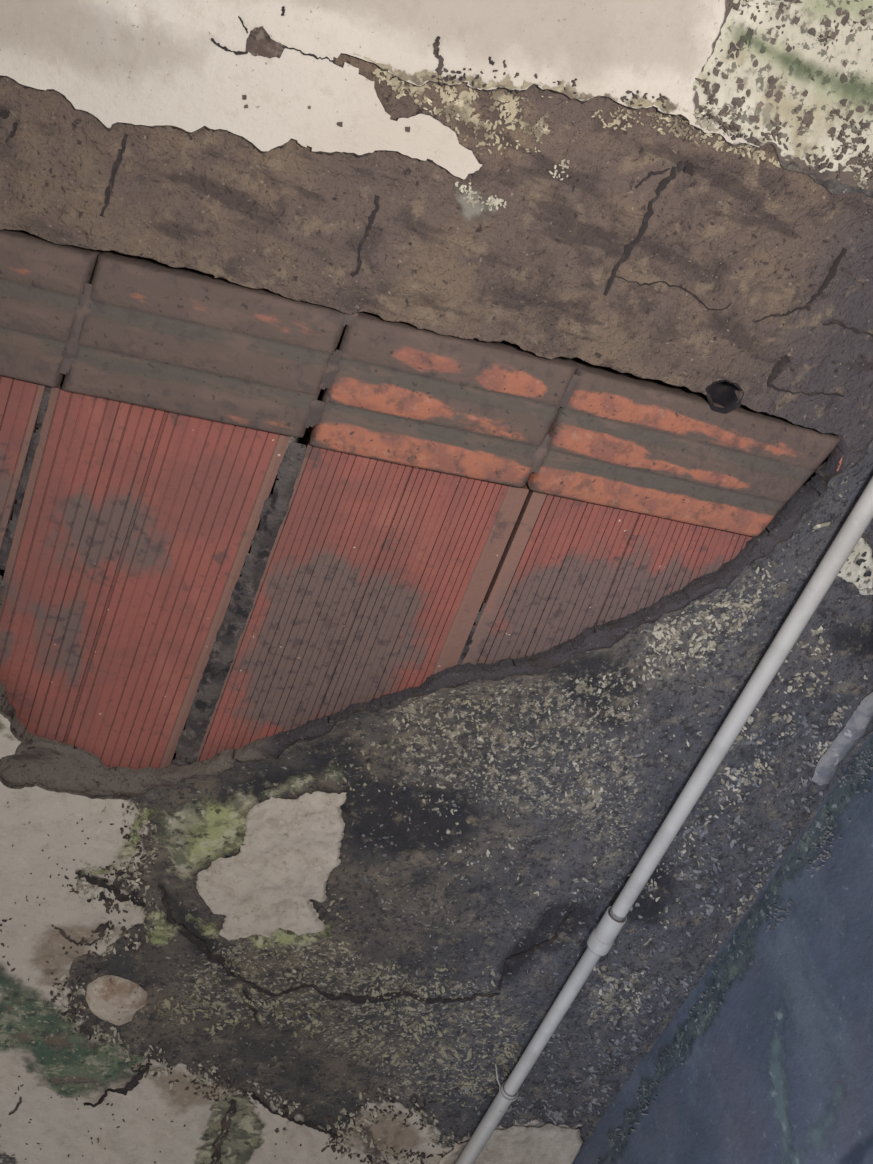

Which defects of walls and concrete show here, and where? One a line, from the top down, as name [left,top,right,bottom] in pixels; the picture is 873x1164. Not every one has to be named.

crack [433,36,444,86]
crack [100,134,128,217]
crack [351,195,380,277]
water stain [454,181,506,218]
water stain [549,159,570,180]
crack [603,162,731,310]
water stain [732,143,873,197]
crack [755,247,873,336]
spalling [0,0,873,800]
water stain [42,440,873,1164]
crack [54,871,576,1026]